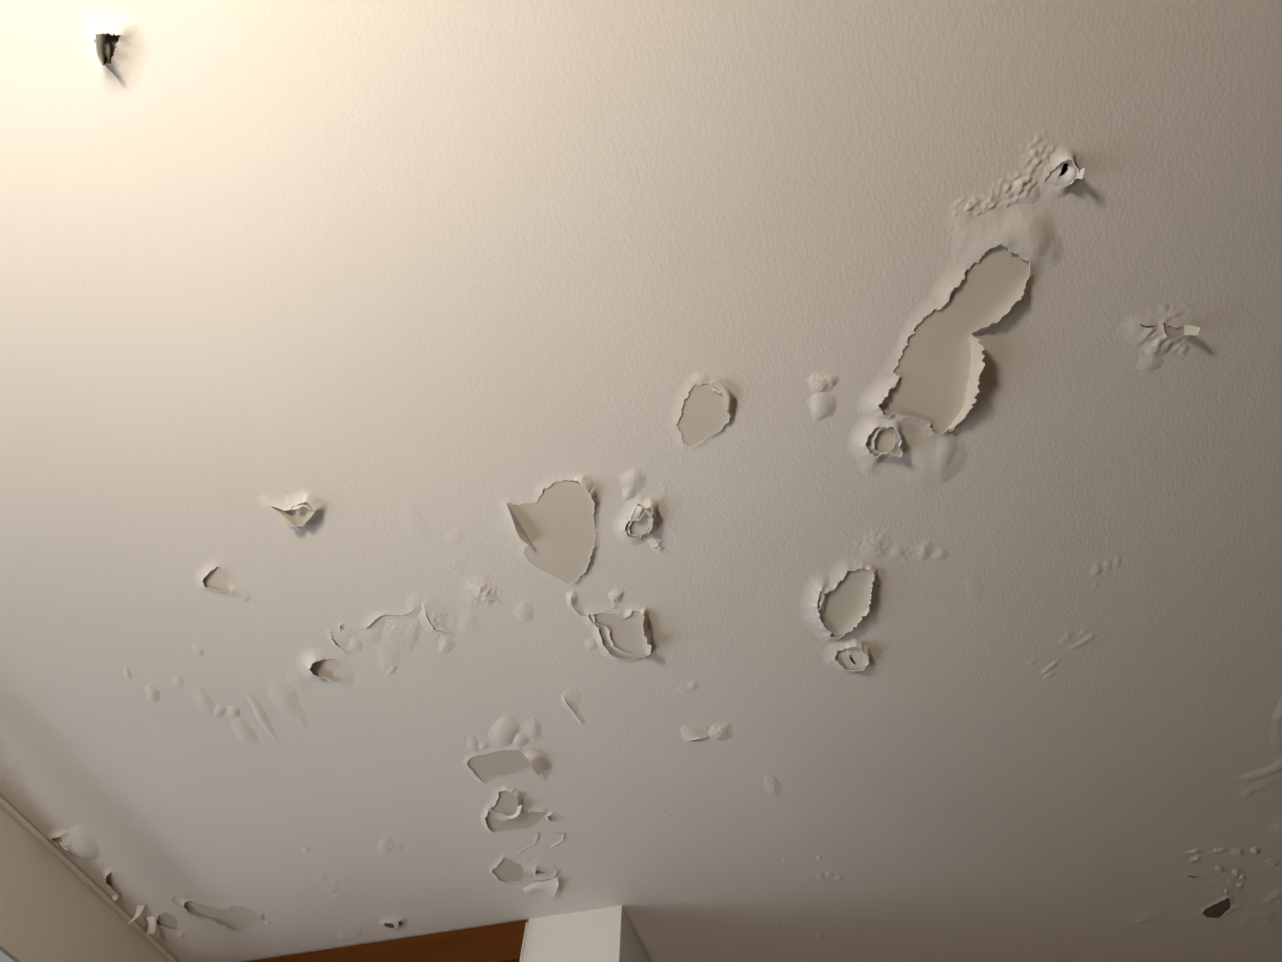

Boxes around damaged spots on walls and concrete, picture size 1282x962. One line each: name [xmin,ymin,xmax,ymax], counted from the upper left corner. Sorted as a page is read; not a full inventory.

peeling [76,6,151,96]
peeling [847,144,1086,490]
peeling [667,371,736,454]
peeling [257,489,327,534]
peeling [193,557,257,605]
peeling [498,471,666,664]
peeling [800,557,879,676]
peeling [285,646,355,692]
peeling [461,745,567,897]
peeling [46,824,272,940]
peeling [1196,894,1247,921]